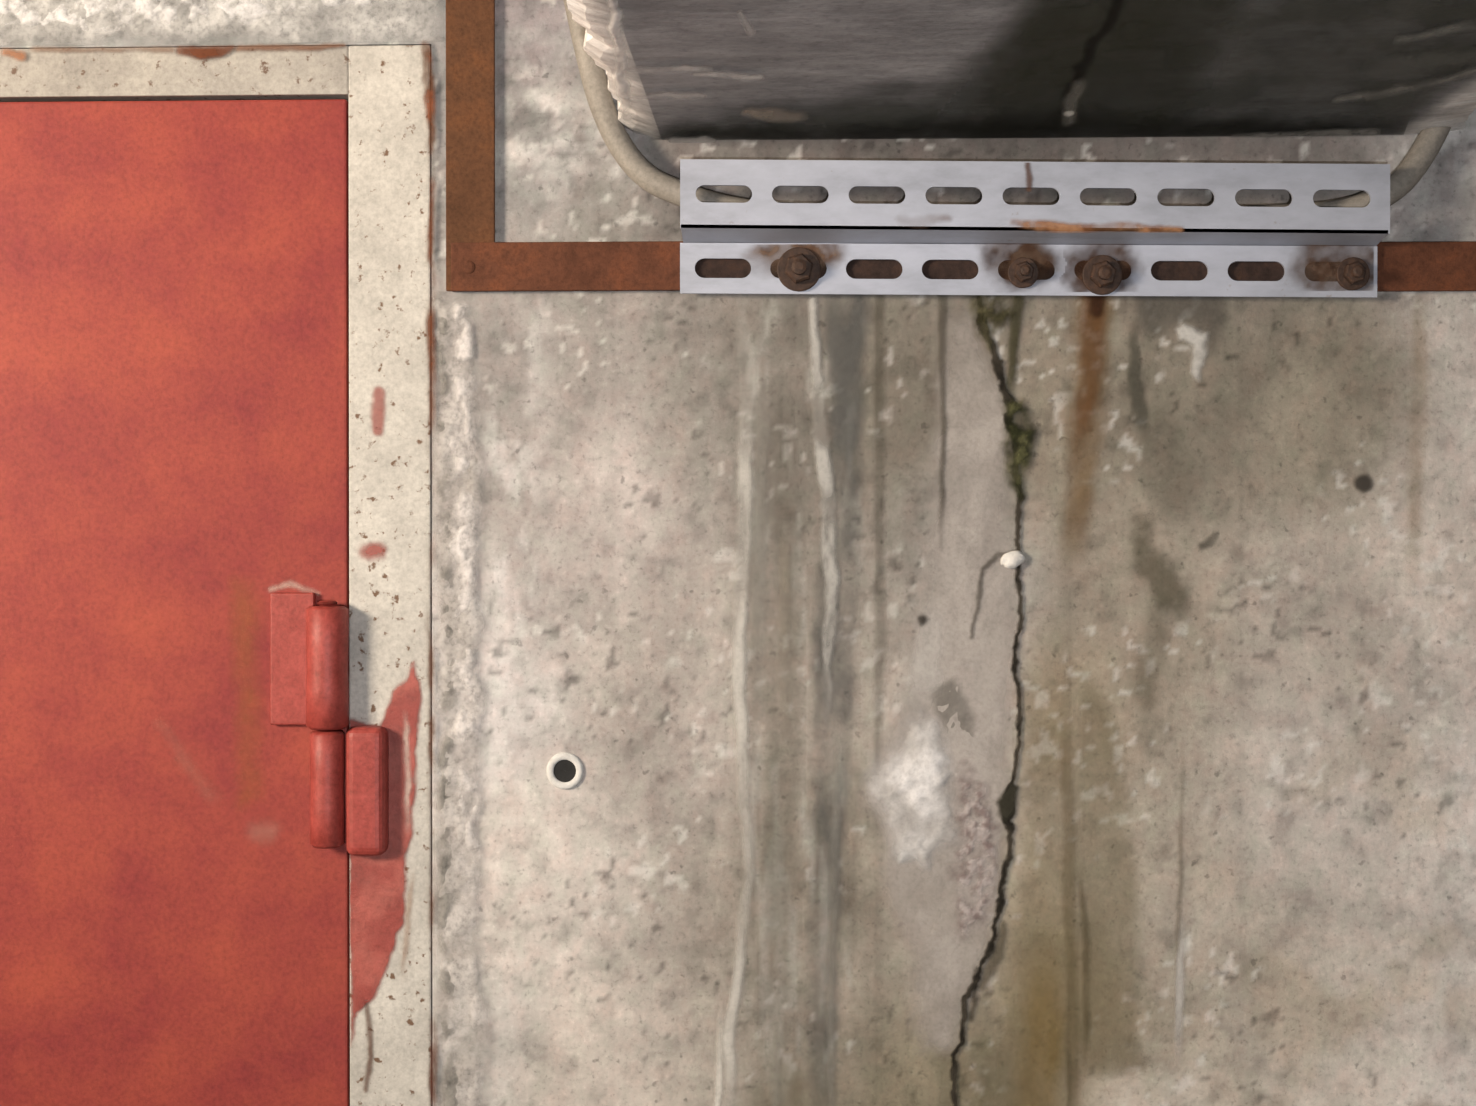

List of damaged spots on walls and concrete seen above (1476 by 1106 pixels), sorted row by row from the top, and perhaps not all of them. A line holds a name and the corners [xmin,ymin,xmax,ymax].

peeling [362,544,384,557]
peeling [373,389,383,434]
water stain [739,451,751,513]
water stain [821,525,838,670]
water stain [809,295,861,497]
spalling [435,301,486,1106]
water stain [732,598,747,774]
water stain [869,327,1011,1045]
crack [950,295,1036,1106]
peeling [350,666,421,1031]
water stain [715,942,744,1106]